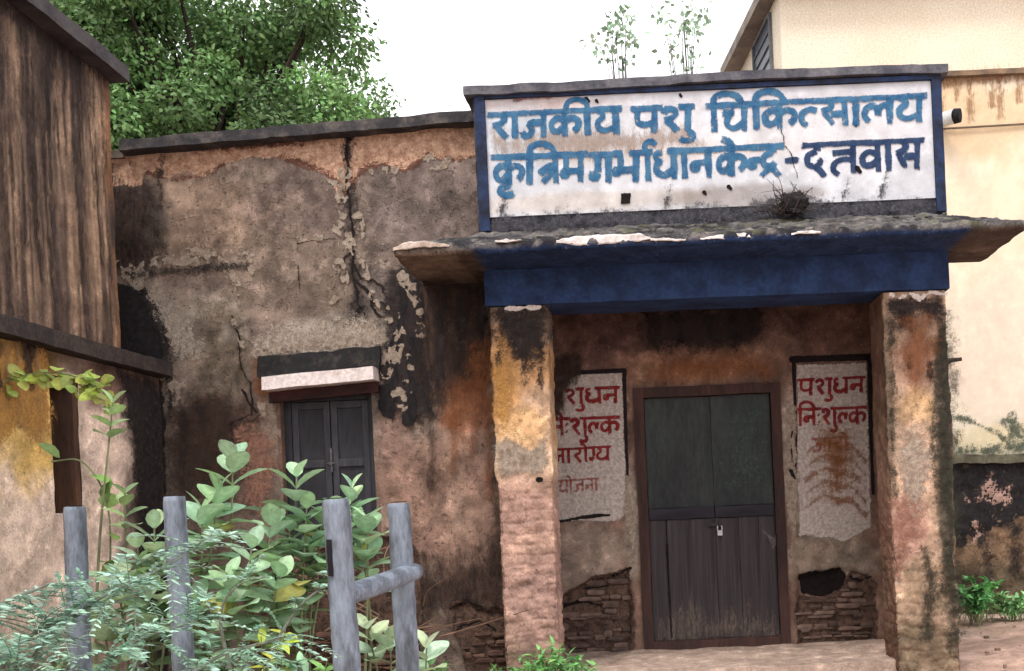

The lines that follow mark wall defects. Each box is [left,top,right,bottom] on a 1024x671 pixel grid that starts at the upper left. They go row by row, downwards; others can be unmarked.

water stain [941,67,1024,118]
water stain [0,0,259,602]
crack [297,137,388,328]
spalling [393,241,449,251]
crack [230,316,267,426]
water stain [251,263,582,494]
corrosion [805,424,868,517]
peeling [964,471,1013,506]
water stain [416,470,503,624]
flaking render [562,473,637,653]
flaking render [795,567,878,644]
water stain [919,545,937,642]